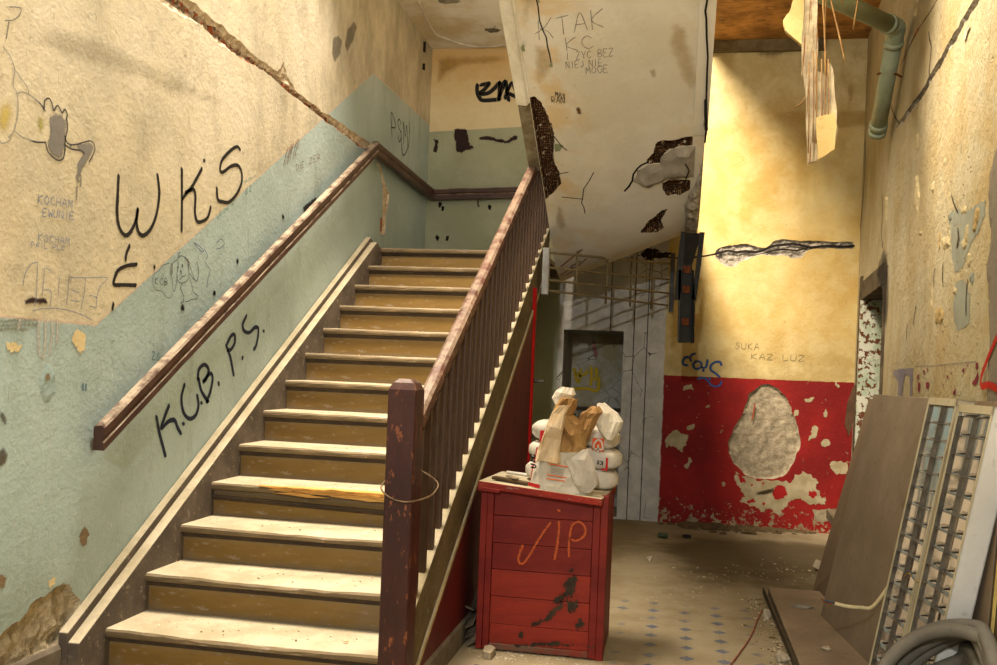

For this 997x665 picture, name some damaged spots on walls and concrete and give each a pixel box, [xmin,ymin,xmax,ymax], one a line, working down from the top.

crack [536,0,552,63]
crack [891,0,937,123]
flaking render [530,96,561,200]
flaking render [647,136,693,164]
flaking render [641,209,667,233]
flaking render [662,161,703,233]
crack [665,172,883,267]
peeling [906,151,990,341]
peeling [665,424,695,469]
flaking render [721,384,830,523]
peeling [830,461,848,475]
flaking render [0,577,81,665]